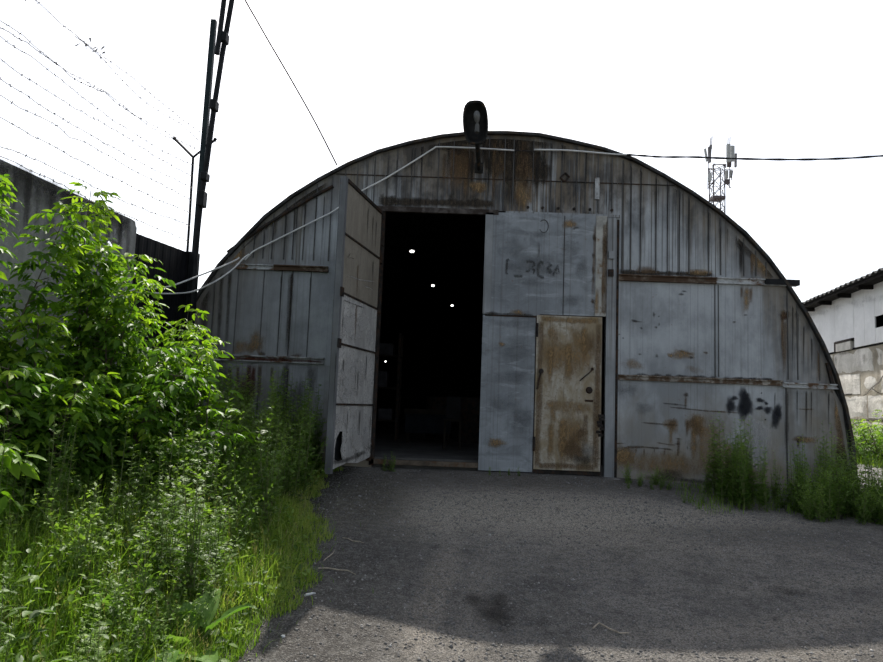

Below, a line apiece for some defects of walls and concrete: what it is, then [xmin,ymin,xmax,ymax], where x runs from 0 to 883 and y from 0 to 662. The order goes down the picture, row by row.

rust [470,139,551,199]
rust [216,333,319,409]
rust [535,222,608,470]
rust [617,393,736,454]